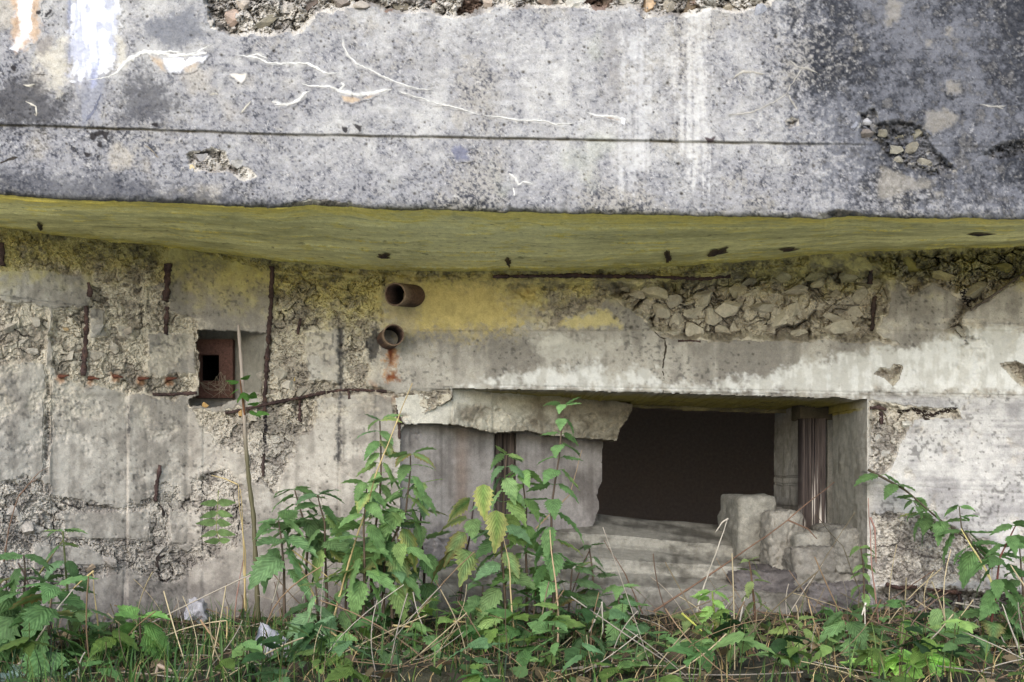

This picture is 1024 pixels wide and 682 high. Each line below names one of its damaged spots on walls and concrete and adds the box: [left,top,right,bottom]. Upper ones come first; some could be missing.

spalling [203,0,771,38]
crack [85,42,212,122]
crack [239,31,626,128]
spalling [185,147,257,181]
peeling [851,76,965,205]
rust [162,263,173,335]
spalling [417,246,1024,345]
rust [225,266,404,439]
spalling [0,227,452,597]
spalling [867,401,962,479]